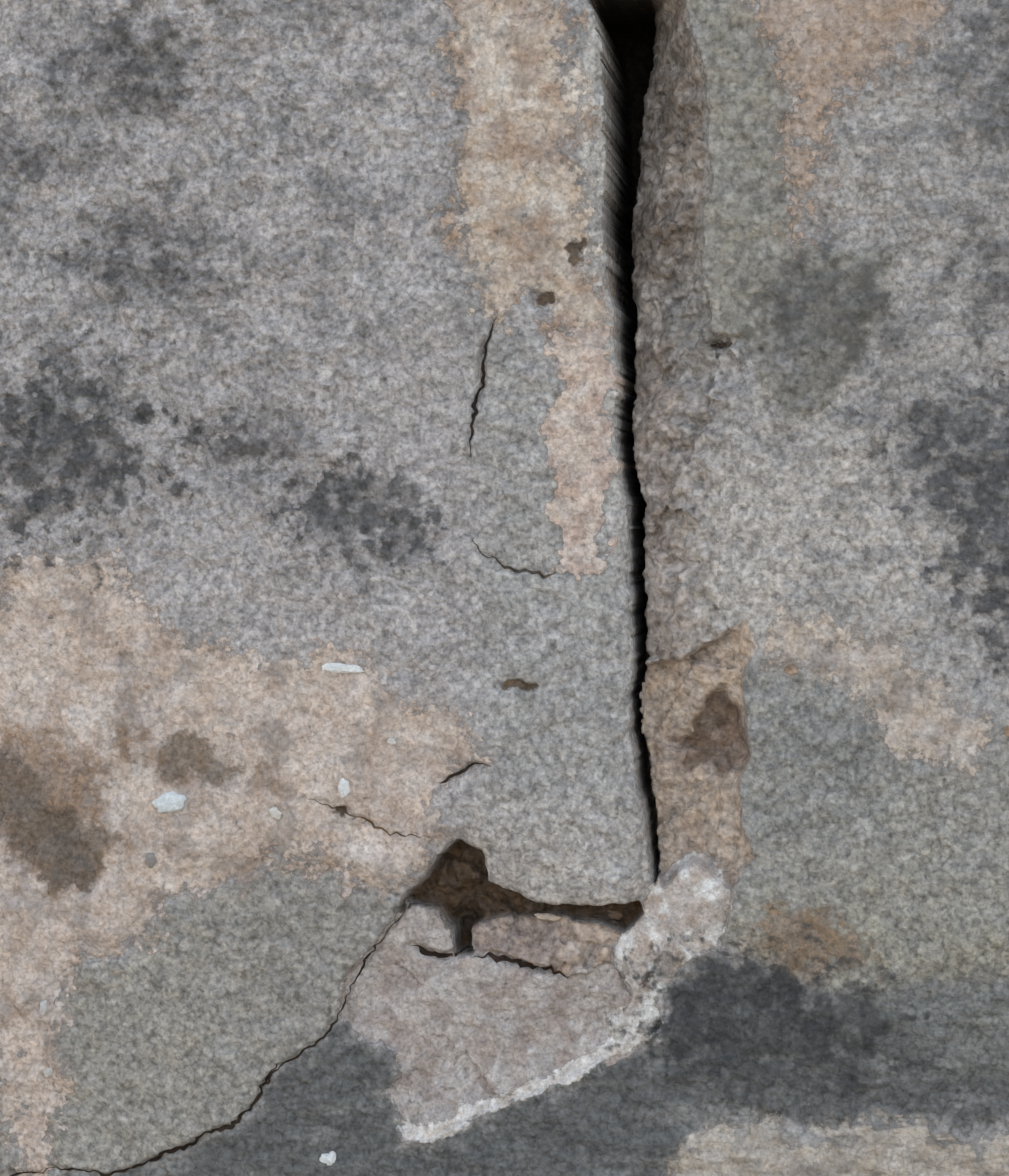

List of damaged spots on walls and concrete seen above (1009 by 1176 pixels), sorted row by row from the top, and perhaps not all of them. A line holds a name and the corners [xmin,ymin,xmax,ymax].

crack [469,310,497,457]
spalling [0,538,664,1176]
crack [11,900,567,1176]